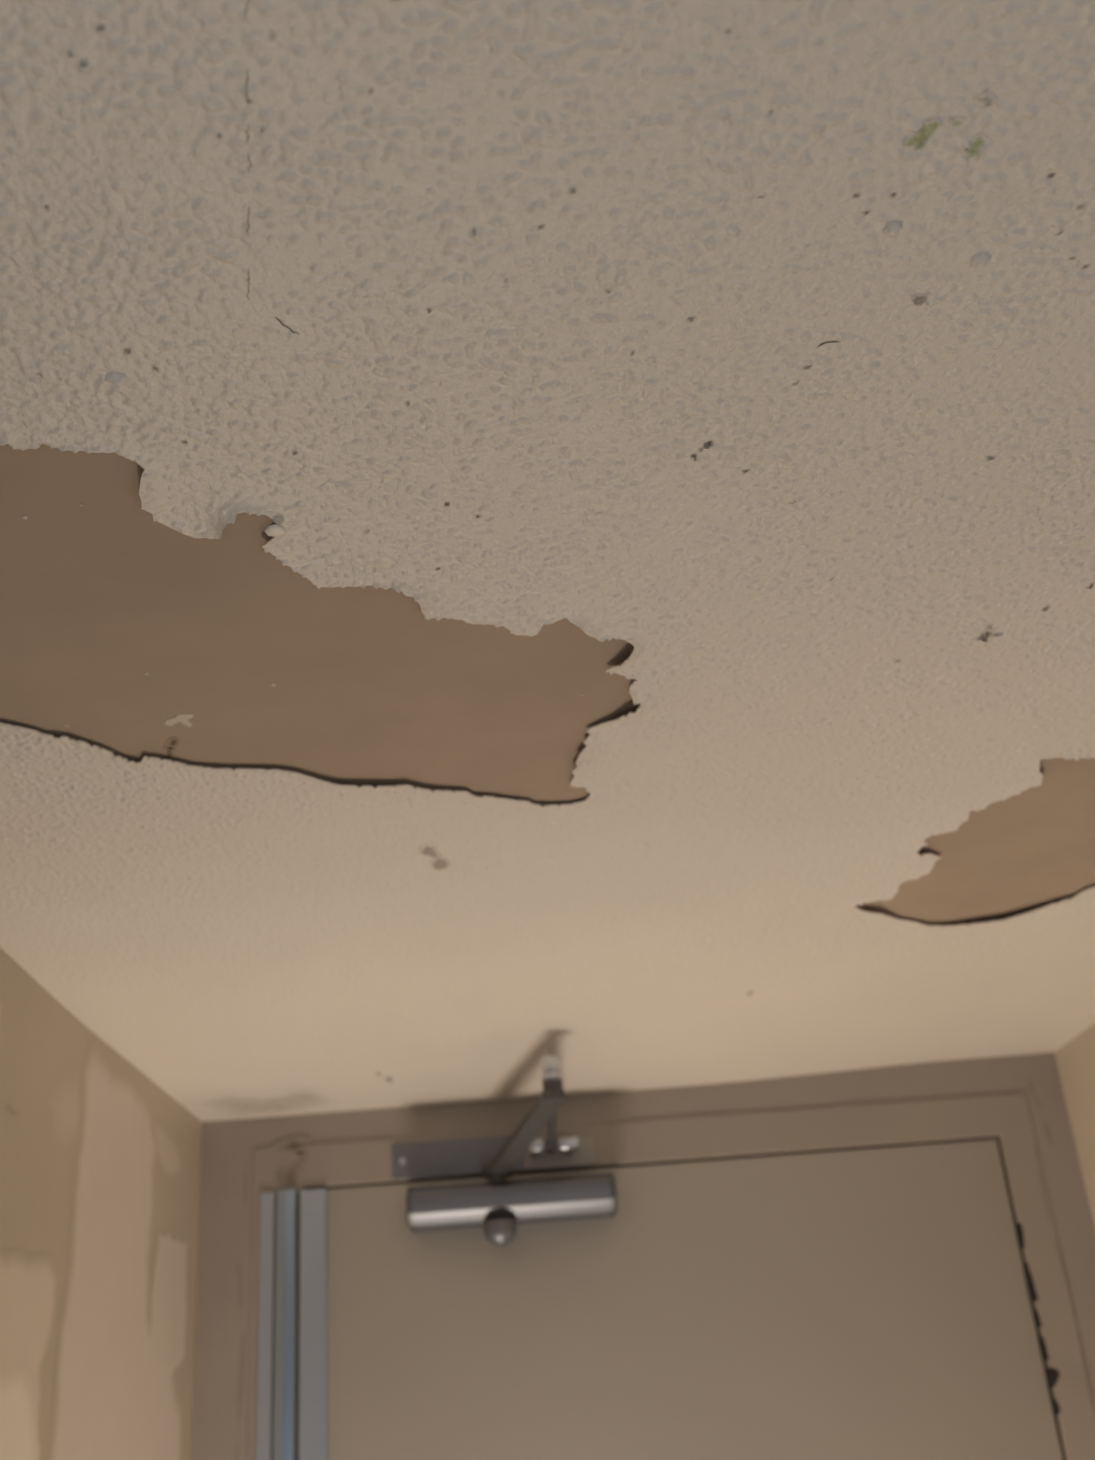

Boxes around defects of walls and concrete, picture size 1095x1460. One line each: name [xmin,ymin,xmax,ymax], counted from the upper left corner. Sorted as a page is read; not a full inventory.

peeling [0,444,640,806]
peeling [856,758,1095,926]